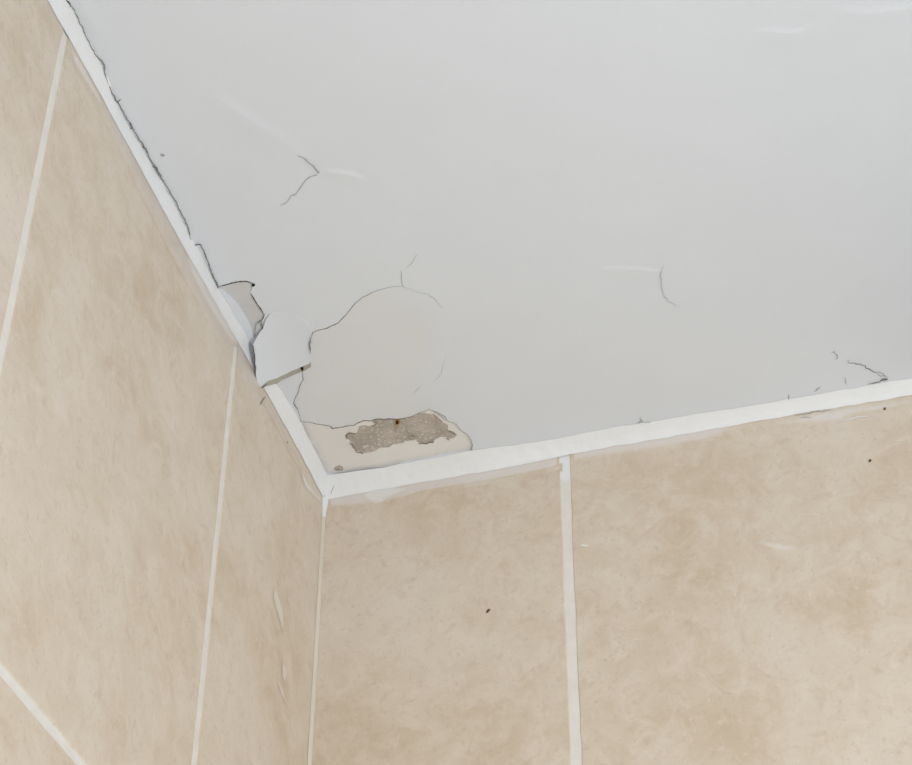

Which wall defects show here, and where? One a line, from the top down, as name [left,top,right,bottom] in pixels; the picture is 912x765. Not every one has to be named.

crack [66,0,219,288]
peeling [219,281,473,474]
crack [831,352,888,384]